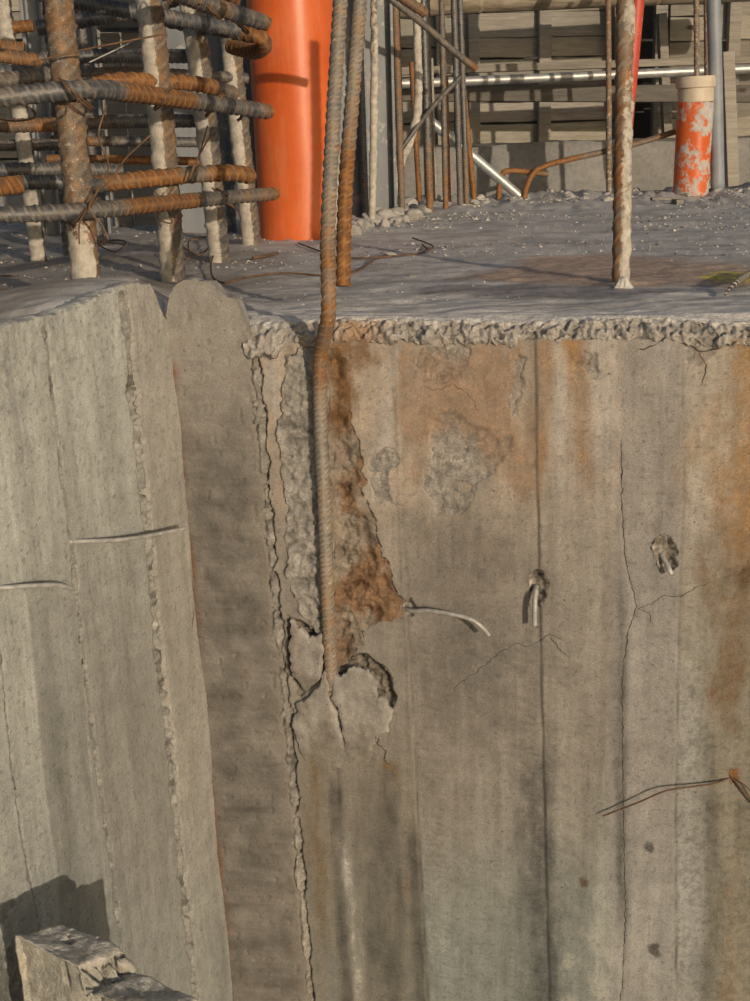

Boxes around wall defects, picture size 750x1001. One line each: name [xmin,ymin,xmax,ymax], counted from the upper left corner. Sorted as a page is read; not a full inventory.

spalling [243,315,320,360]
corrosion [330,340,370,428]
spalling [286,312,750,765]
crack [454,633,571,688]
crack [620,444,713,1000]
damp [340,848,356,924]
peeling [0,945,23,1001]
damp [341,932,362,994]